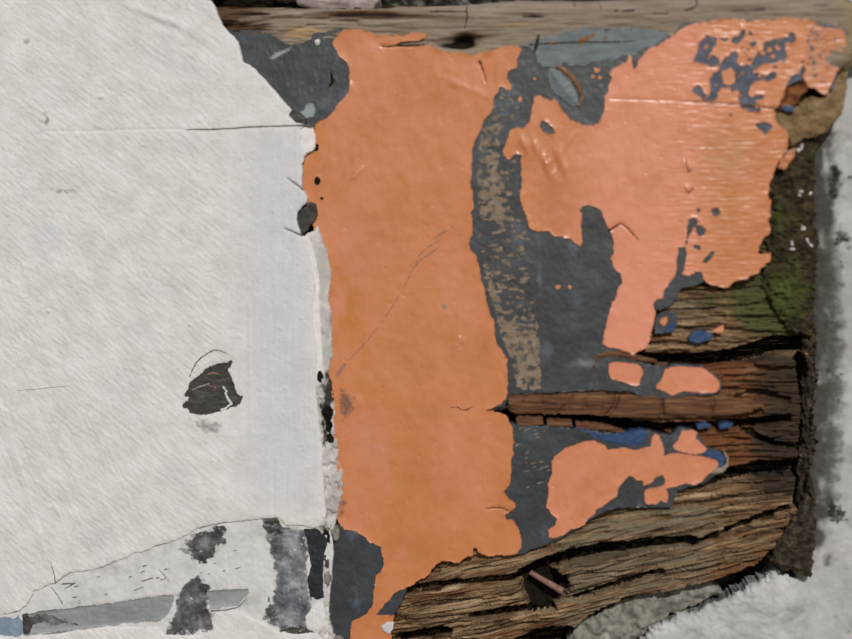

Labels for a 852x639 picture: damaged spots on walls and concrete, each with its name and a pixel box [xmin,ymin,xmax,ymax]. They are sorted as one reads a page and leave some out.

peeling [227,27,350,128]
peeling [692,19,796,112]
peeling [787,61,806,86]
crack [186,123,313,131]
peeling [755,122,772,135]
peeling [776,148,796,170]
peeling [297,197,323,234]
peeling [469,20,722,411]
peeling [182,350,243,415]
hole [321,404,334,443]
peeling [504,420,733,555]
peeling [0,518,408,639]